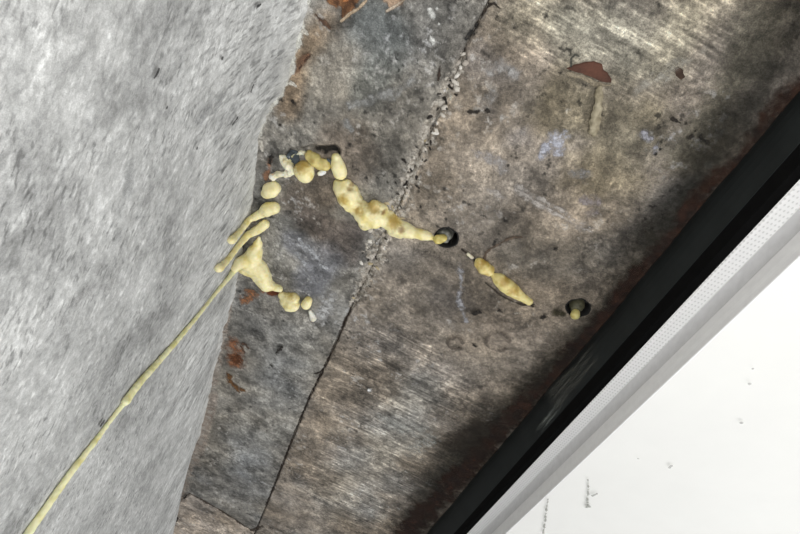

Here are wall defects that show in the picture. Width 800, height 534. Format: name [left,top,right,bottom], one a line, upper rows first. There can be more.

crack [456,0,500,73]
crack [461,236,523,262]
crack [485,282,535,307]
leakage [385,0,800,534]
rust [226,339,249,393]
crack [182,231,386,534]